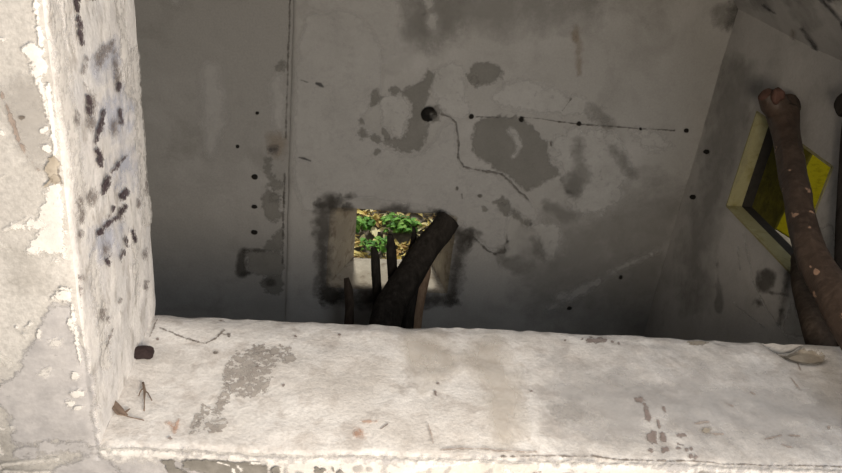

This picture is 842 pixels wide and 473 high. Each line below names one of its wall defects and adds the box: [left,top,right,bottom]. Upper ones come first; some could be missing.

peeling [9,0,97,263]
peeling [115,0,152,225]
peeling [359,62,501,155]
crack [441,114,528,199]
peeling [472,115,560,191]
peeling [50,243,114,411]
peeling [189,344,296,434]
peeling [99,397,842,473]